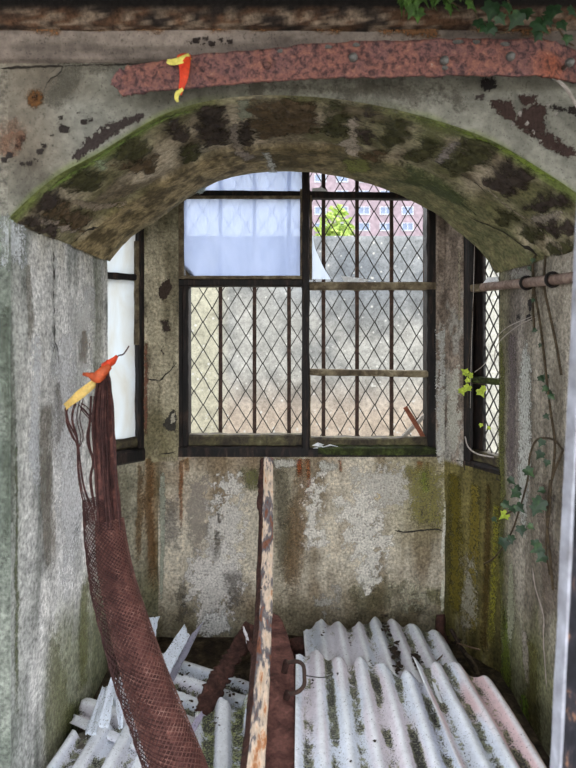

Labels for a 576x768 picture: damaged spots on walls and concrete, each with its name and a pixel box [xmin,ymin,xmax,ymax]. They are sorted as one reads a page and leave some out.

rust [27,89,44,109]
peeling [1,115,70,166]
peeling [18,110,160,239]
water stain [226,82,277,173]
water stain [335,118,363,157]
spalling [161,98,575,256]
peeling [475,76,576,158]
water stain [0,217,27,269]
rust [135,459,156,579]
rust [179,458,189,525]
rust [284,459,311,586]
water stain [447,327,558,742]